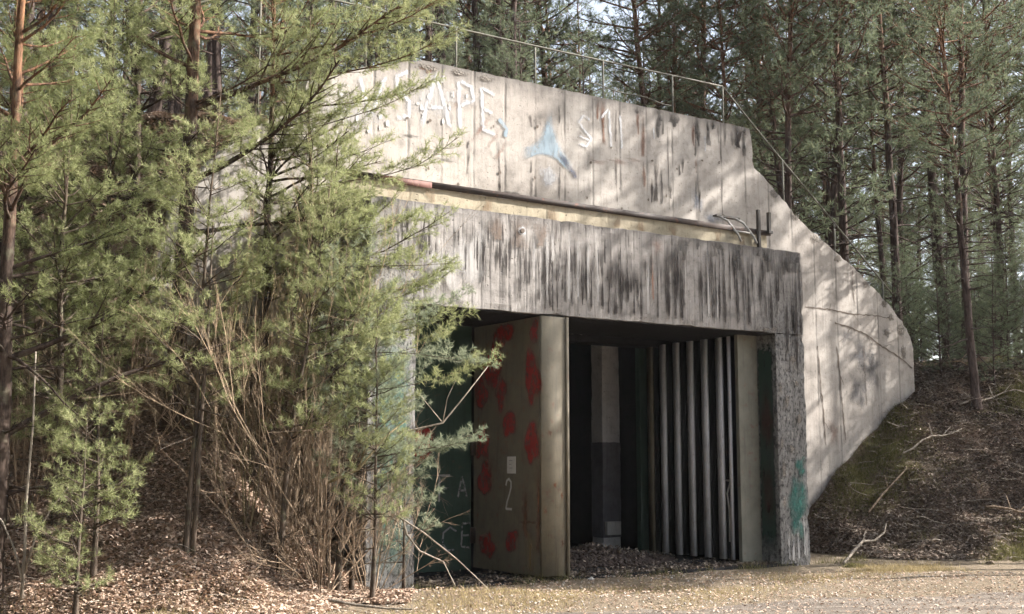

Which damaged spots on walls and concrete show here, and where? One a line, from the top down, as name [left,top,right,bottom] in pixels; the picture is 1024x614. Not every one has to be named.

leakage [651,124,745,209]
leakage [396,207,446,291]
leakage [457,219,803,376]
crack [808,270,912,445]